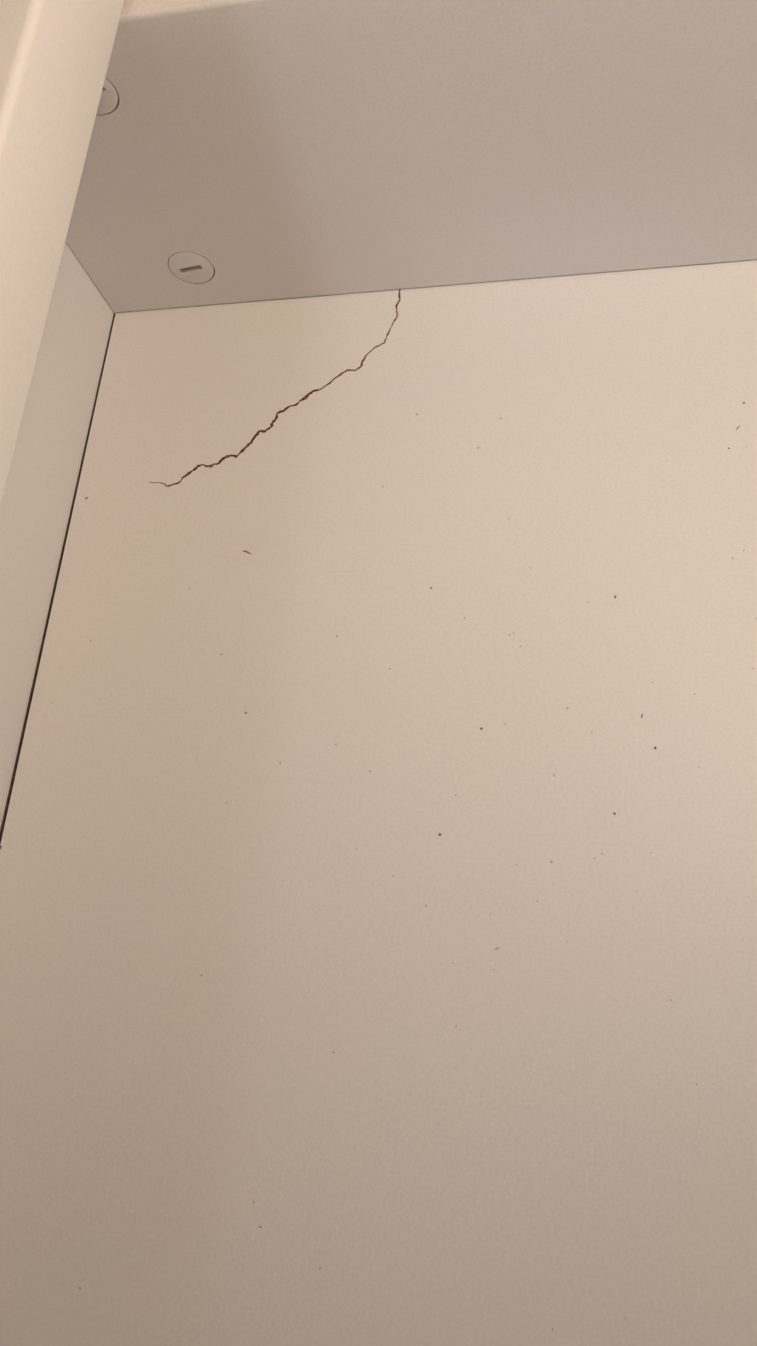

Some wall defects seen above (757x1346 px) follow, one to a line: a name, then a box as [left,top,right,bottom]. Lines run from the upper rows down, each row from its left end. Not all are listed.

crack [149,289,401,487]